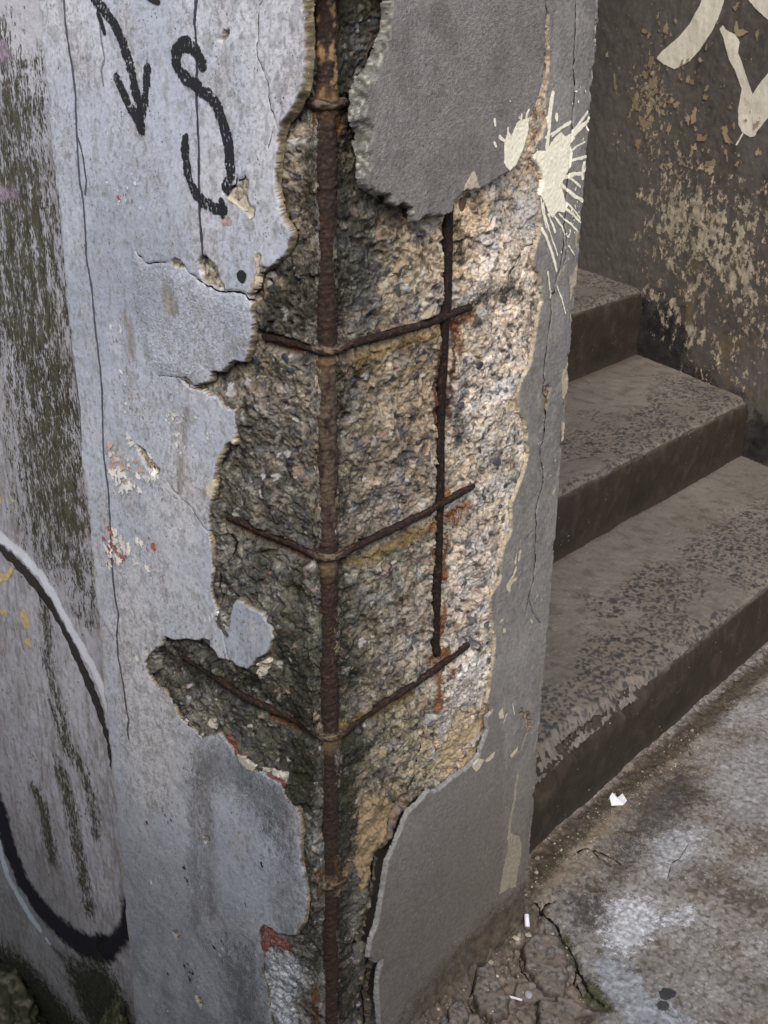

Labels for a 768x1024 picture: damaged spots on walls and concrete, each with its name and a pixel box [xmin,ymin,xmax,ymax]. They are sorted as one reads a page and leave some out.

peeling [733,2,760,40]
peeling [592,12,768,411]
crack [137,253,255,301]
corrosion [431,310,477,425]
crack [526,5,576,623]
leakage [2,330,99,632]
peeling [102,526,156,572]
peeling [107,432,171,494]
spalling [128,0,581,1024]
corrosion [426,600,456,713]
crack [534,902,606,1009]